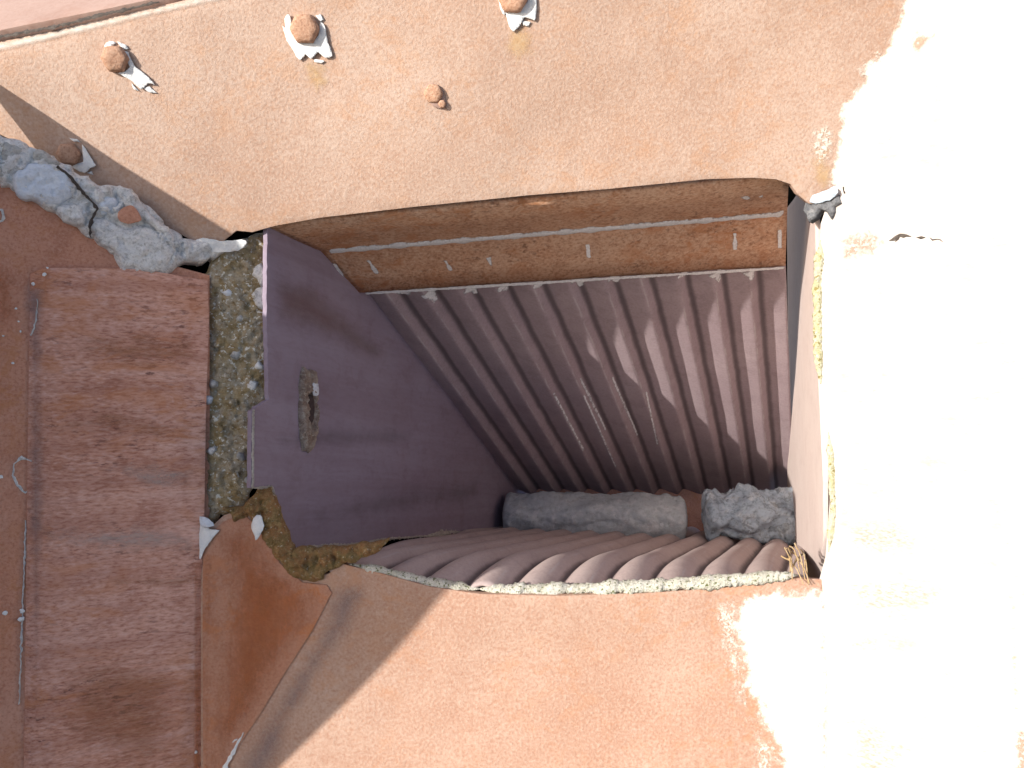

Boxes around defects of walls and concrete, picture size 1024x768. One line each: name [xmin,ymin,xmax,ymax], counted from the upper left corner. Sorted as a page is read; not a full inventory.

peeling [104,41,156,93]
peeling [283,14,332,64]
peeling [499,0,537,32]
peeling [803,0,915,224]
crack [56,165,99,238]
spalling [0,135,265,559]